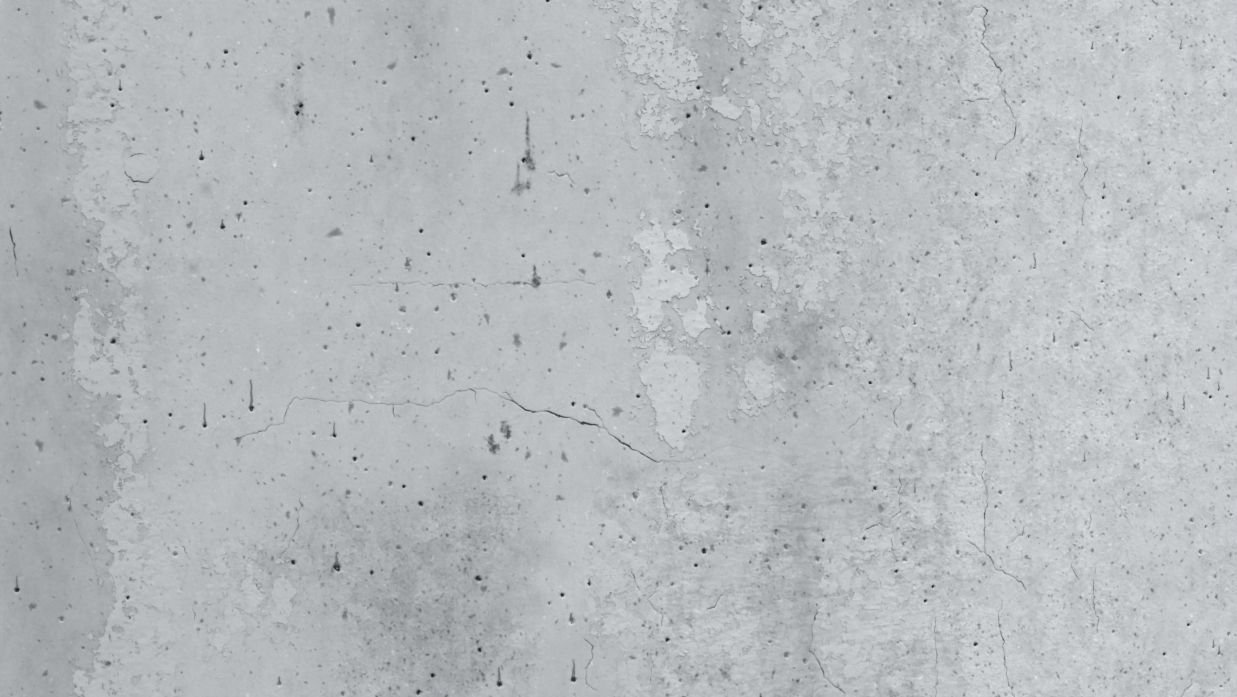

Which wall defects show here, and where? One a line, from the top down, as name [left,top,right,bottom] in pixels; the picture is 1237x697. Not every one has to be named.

crack [964,6,1017,160]
peeling [594,0,866,419]
peeling [624,209,732,544]
crack [279,495,302,559]
crack [234,388,769,533]
peeling [581,543,654,640]
peeling [661,609,766,665]
crack [808,609,845,694]
crack [970,442,1026,695]